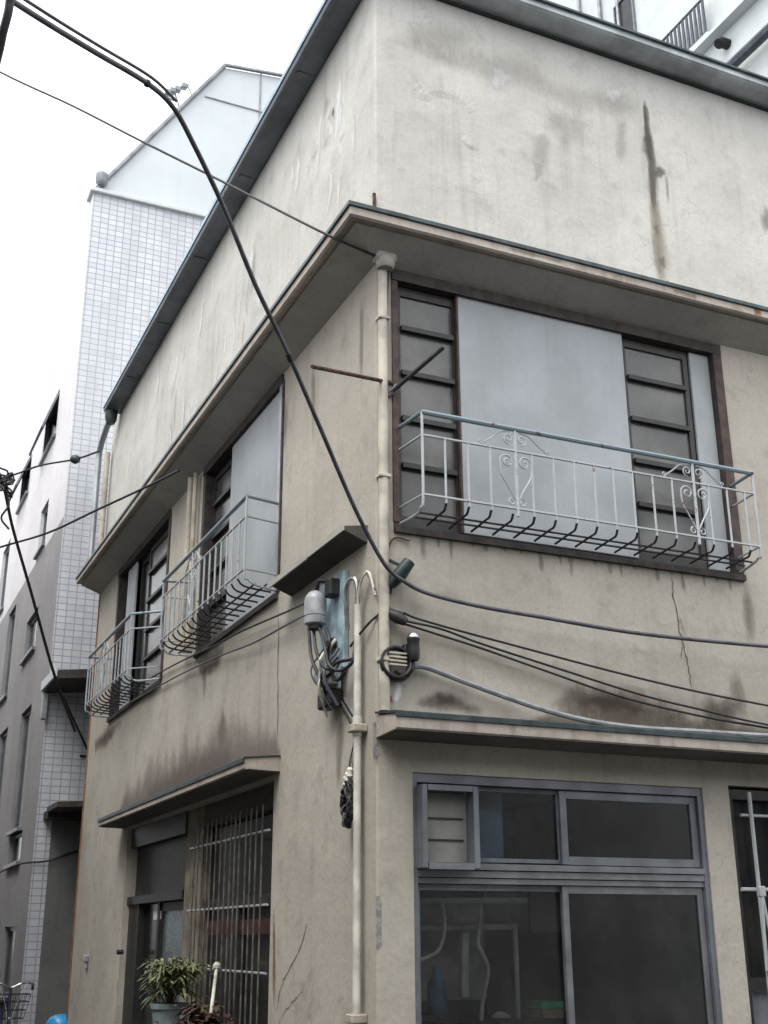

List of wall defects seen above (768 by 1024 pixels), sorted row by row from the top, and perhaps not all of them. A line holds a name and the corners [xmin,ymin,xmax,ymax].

damp [644,106,664,205]
crack [672,581,692,688]
damp [427,694,470,709]
damp [540,692,767,733]
crack [277,924,307,1022]